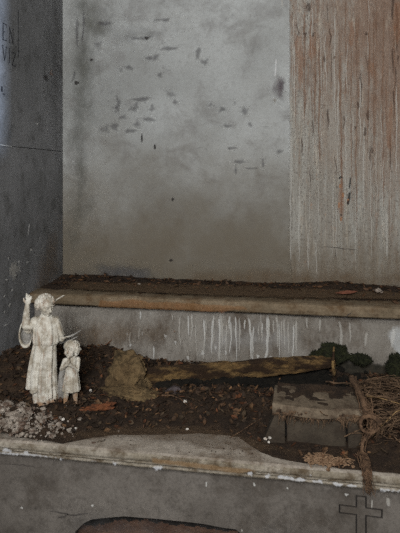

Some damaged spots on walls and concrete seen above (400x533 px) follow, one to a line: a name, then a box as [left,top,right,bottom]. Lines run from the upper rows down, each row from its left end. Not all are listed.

rust [290,0,400,286]
efflorescence [203,317,237,355]
efflorescence [244,319,269,359]